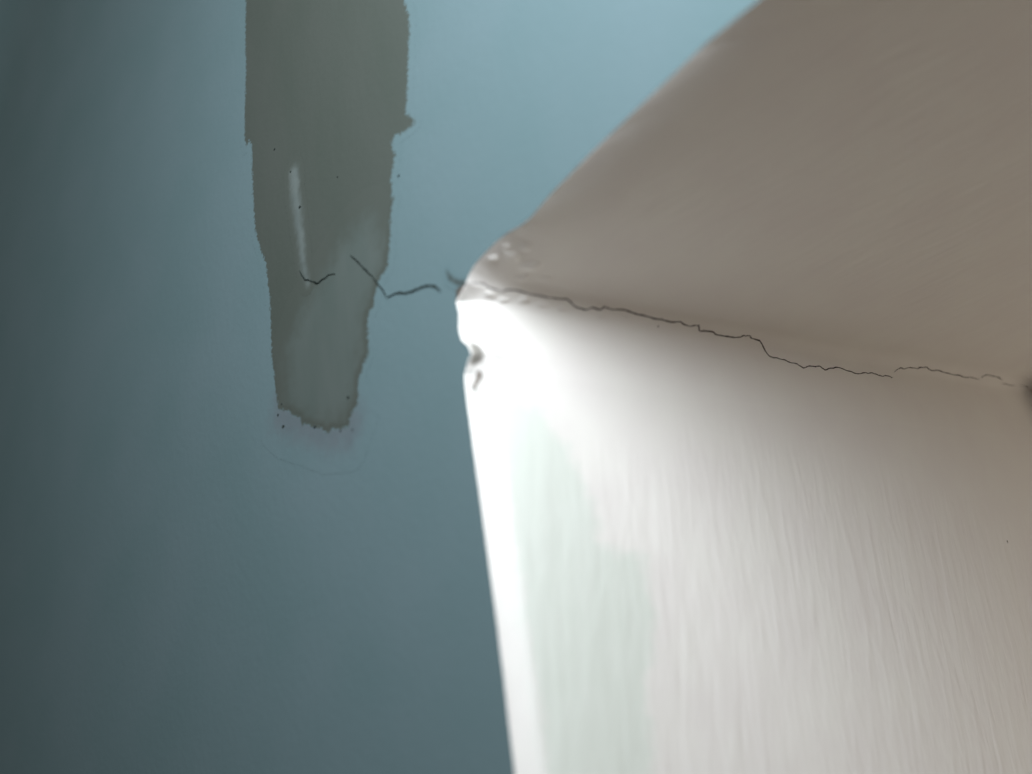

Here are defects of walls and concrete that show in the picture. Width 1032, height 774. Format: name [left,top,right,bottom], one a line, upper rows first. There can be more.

peeling [240,0,422,475]
crack [299,255,440,297]
crack [467,282,1027,387]